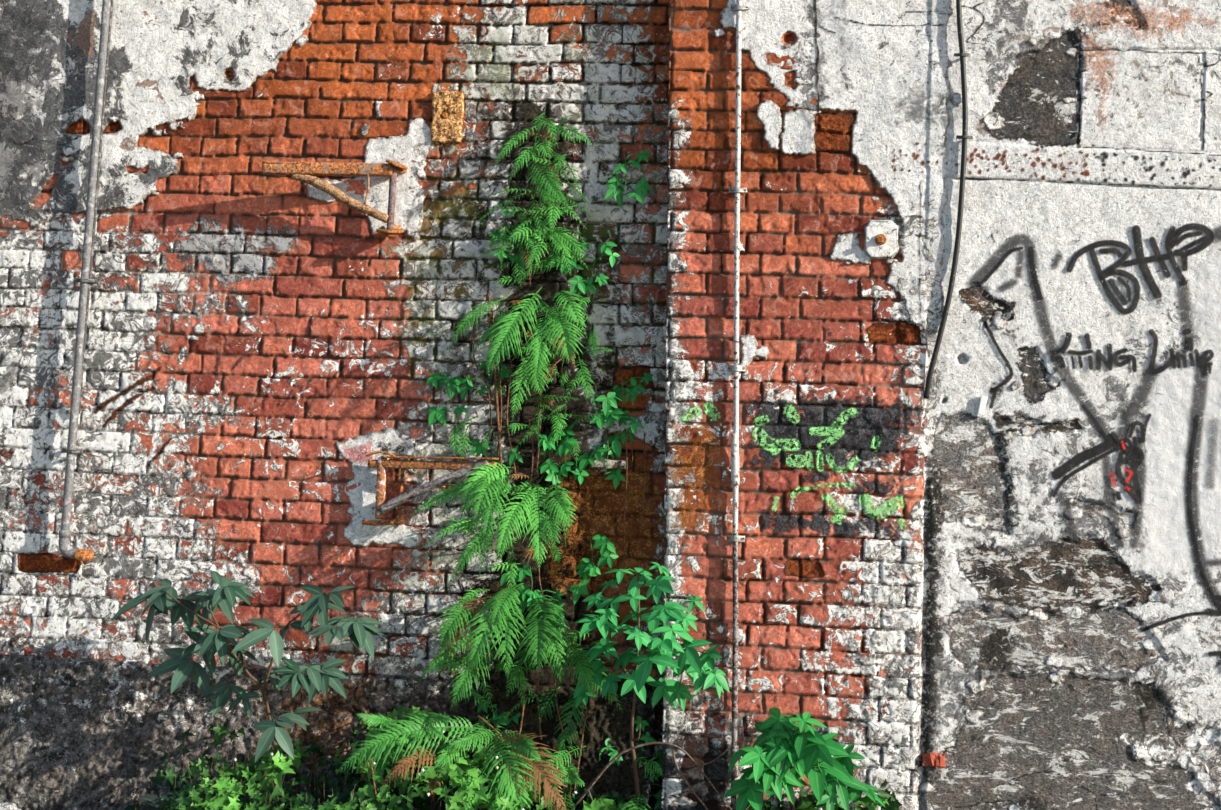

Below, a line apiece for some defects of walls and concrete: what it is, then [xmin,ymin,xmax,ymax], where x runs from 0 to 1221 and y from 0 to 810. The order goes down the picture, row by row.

peeling [0,0,707,699]
peeling [642,668,697,810]
flaking render [712,0,1221,810]